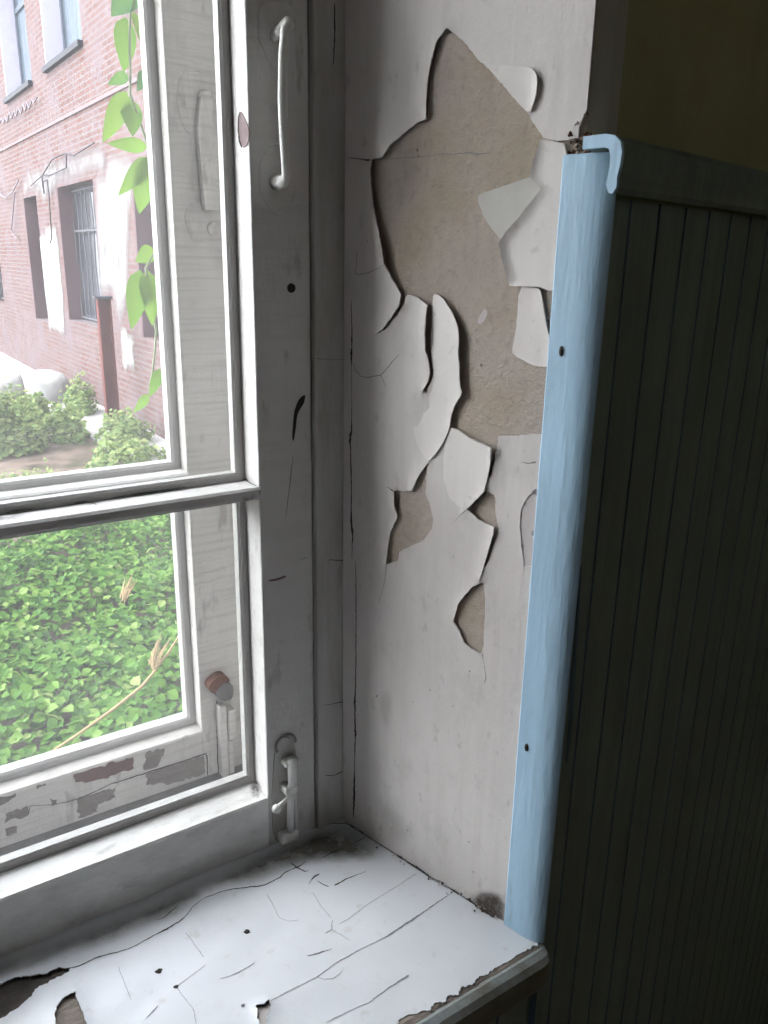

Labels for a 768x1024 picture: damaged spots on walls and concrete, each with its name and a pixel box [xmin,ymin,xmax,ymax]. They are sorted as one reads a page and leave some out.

peeling [348,30,592,600]
crack [72,305,496,1023]
peeling [456,583,486,683]
peeling [0,729,219,836]
peeling [0,970,69,1019]
peeling [55,995,86,1024]
peeling [241,1002,271,1024]
spalling [400,945,540,1024]